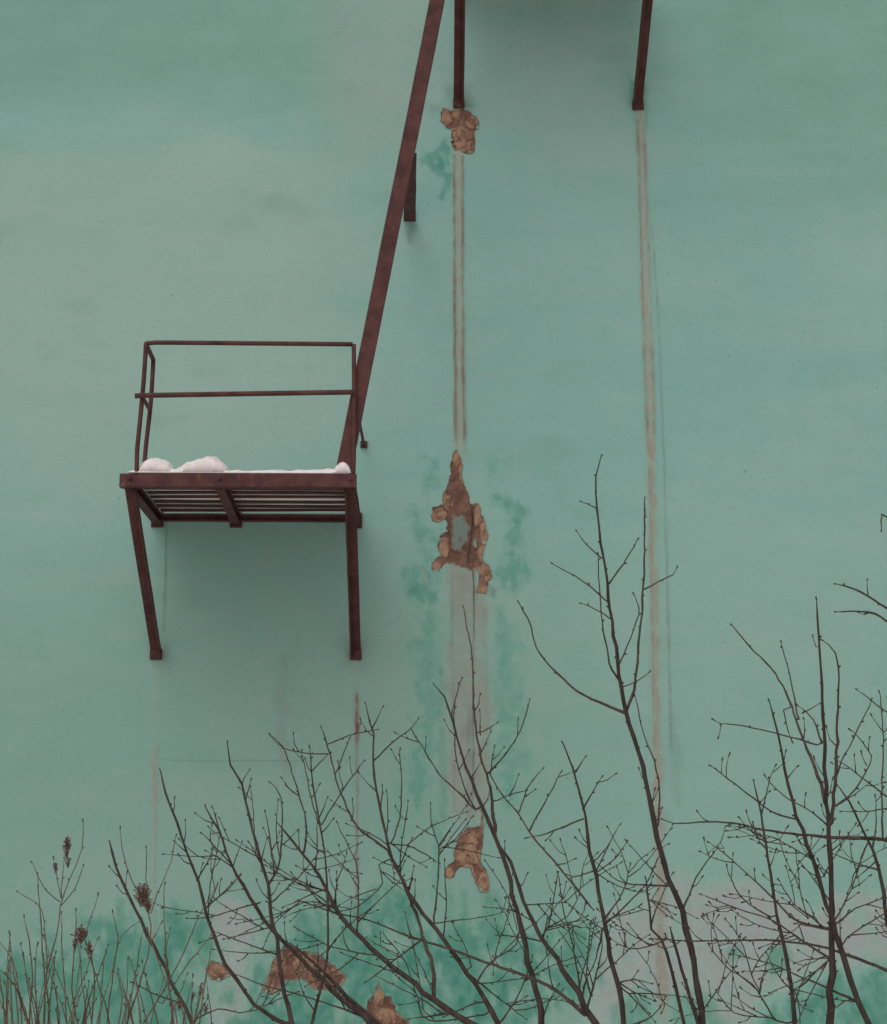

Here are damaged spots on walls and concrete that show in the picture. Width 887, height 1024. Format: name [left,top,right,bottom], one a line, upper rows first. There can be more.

flaking render [422,108,479,199]
rust [453,151,466,444]
rust [637,112,658,621]
flaking render [402,449,531,603]
leakage [416,564,521,812]
flaking render [445,810,489,892]
flaking render [204,961,230,982]
flaking render [261,945,347,994]
flaking render [362,983,409,1024]
leakage [0,879,887,1024]
rust [655,849,668,1009]